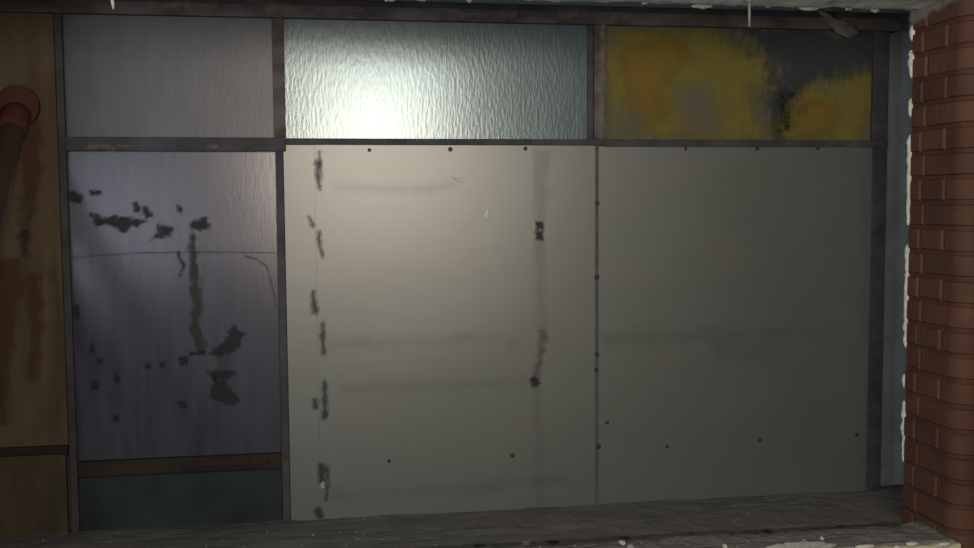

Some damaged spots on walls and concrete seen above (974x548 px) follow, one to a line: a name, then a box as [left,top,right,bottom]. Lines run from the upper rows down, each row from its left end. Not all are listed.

peeling [69,191,101,203]
peeling [89,202,173,238]
peeling [191,217,210,230]
peeling [211,326,244,355]
peeling [209,370,239,405]